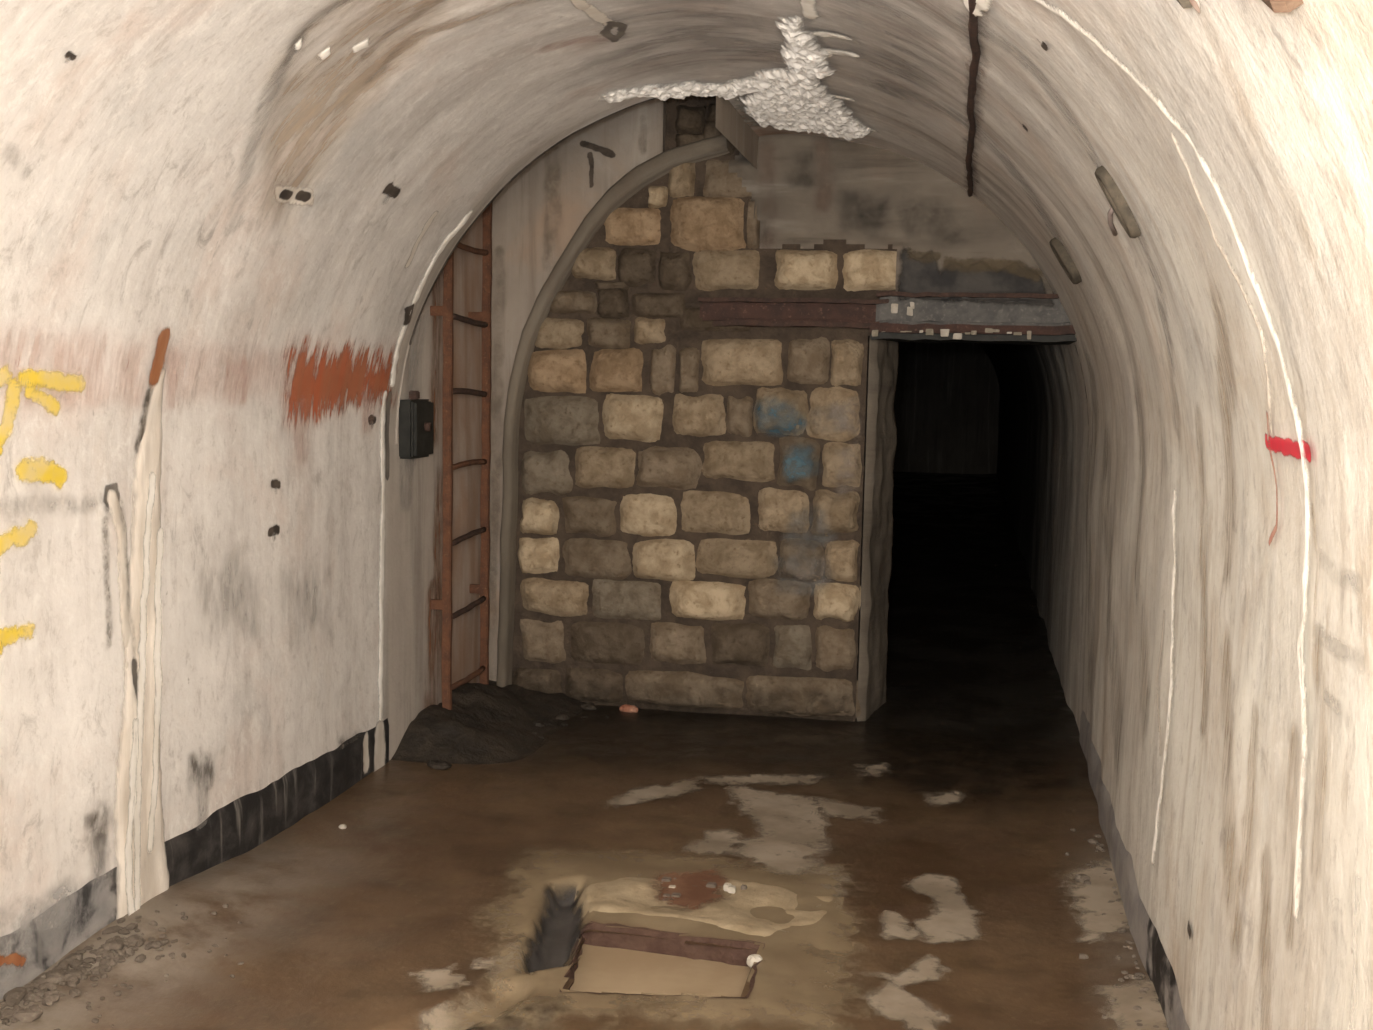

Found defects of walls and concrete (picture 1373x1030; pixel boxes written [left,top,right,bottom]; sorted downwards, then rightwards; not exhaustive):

crack [963,0,991,17]
crack [1034,0,1323,921]